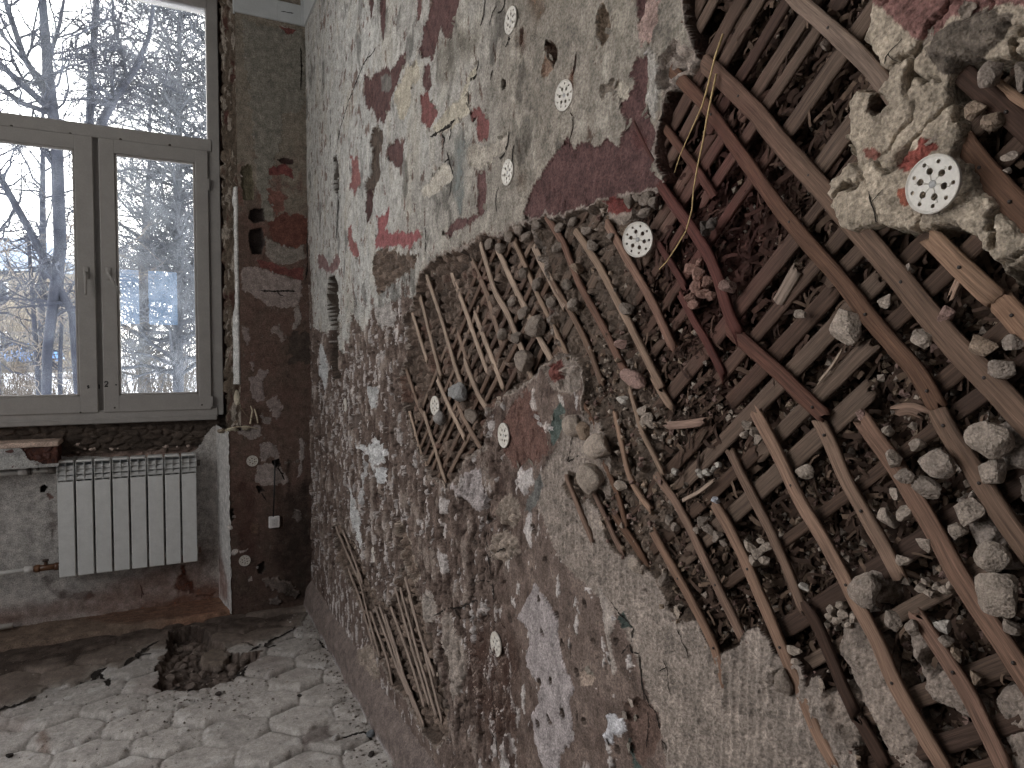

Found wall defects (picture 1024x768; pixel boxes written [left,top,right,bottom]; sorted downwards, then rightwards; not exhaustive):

peeling [824,0,1024,46]
peeling [896,134,940,173]
flaking render [642,222,697,322]
flaking render [517,318,541,362]
flaking render [656,288,723,388]
flaking render [679,438,754,510]
peeling [523,513,532,549]
flaking render [332,436,469,749]
crack [80,641,158,686]
crack [236,627,295,677]
peeling [517,583,595,768]
crack [0,696,36,709]